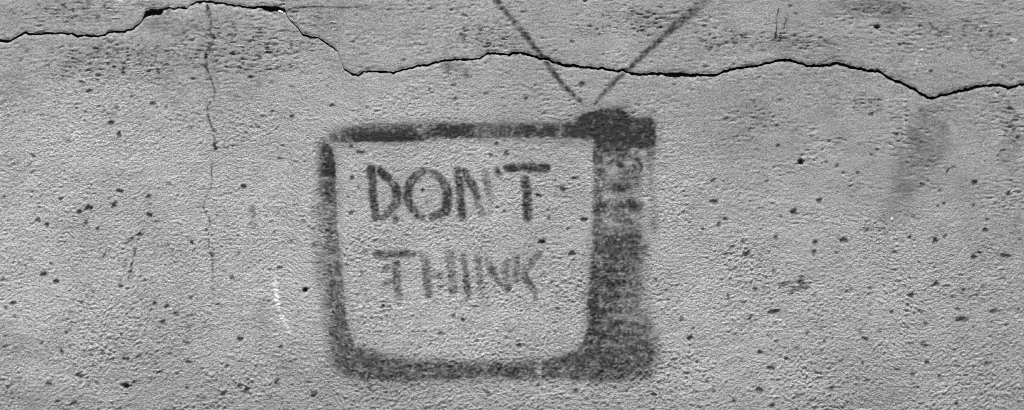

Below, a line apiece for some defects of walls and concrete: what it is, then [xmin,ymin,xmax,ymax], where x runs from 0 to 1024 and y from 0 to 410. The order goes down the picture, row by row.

crack [0,0,1024,175]